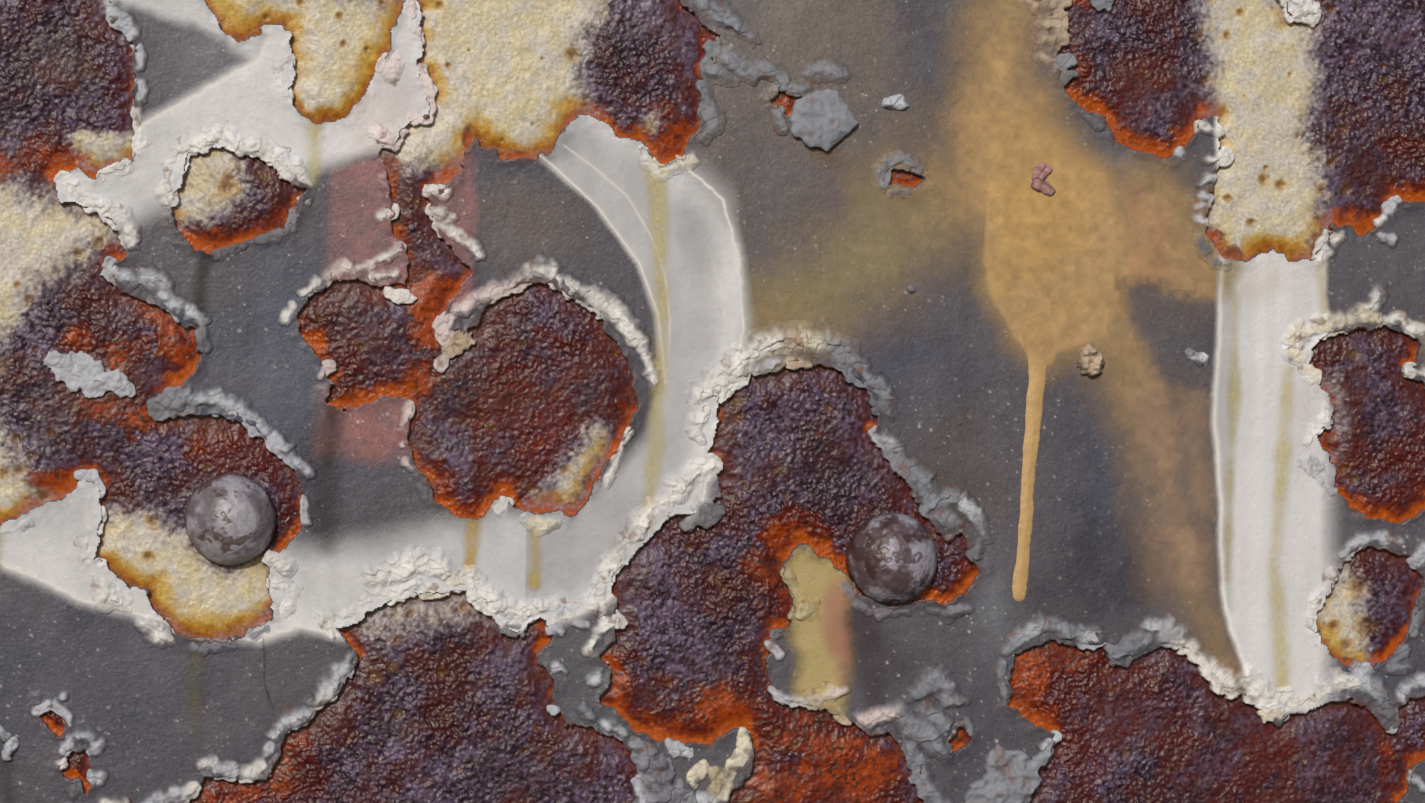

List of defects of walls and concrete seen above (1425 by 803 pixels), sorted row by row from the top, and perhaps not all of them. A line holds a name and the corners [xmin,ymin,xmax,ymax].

rust [0,0,994,803]
peeling [1031,162,1056,196]
rust [993,281,1425,803]
rust [1015,0,1425,282]